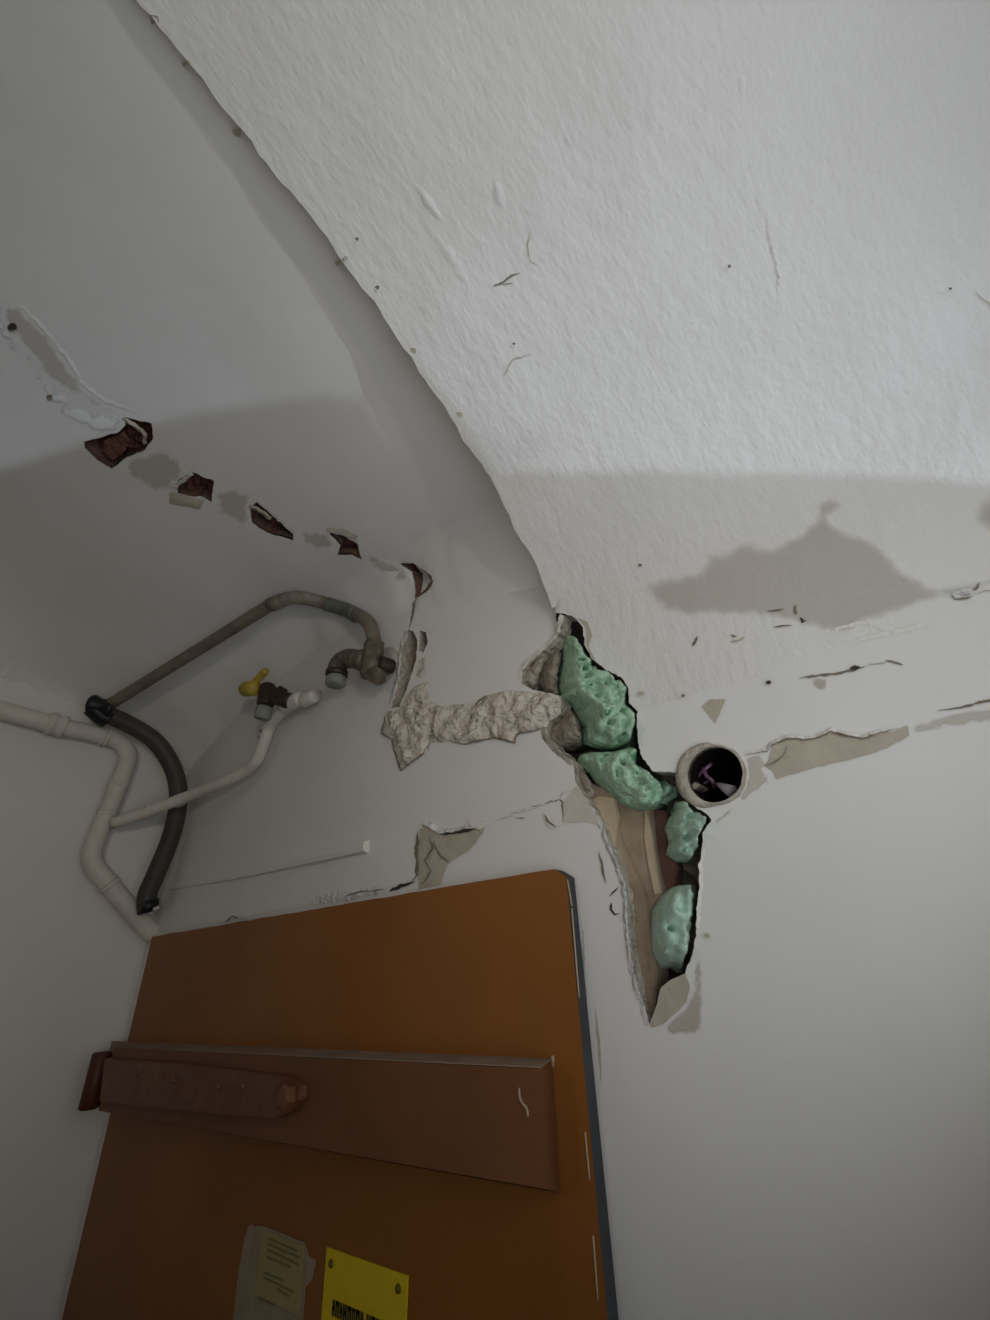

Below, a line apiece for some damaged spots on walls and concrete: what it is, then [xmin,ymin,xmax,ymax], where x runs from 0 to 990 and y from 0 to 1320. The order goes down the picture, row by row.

flaking render [84,417,153,469]
flaking render [169,471,214,510]
flaking render [248,502,294,538]
flaking render [326,528,361,558]
flaking render [401,563,433,598]
peeling [702,699,726,723]
flaking render [743,697,990,799]
flaking render [380,614,711,1028]